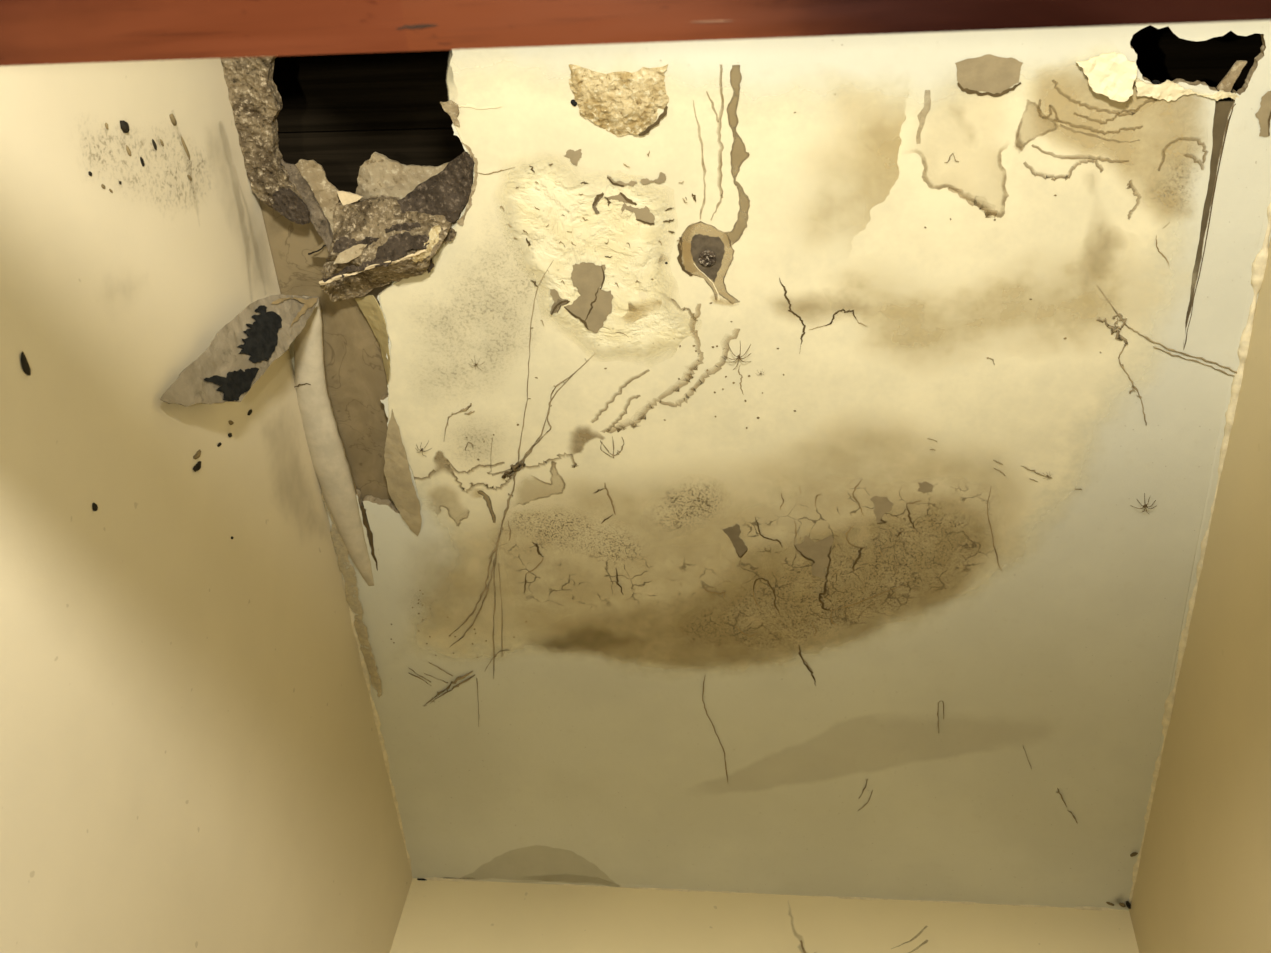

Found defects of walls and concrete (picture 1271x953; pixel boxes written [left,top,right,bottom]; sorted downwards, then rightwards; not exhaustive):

peeling [440,100,502,127]
spalling [569,64,669,137]
crack [1156,101,1236,349]
peeling [160,56,478,536]
peeling [531,242,618,333]
crack [779,278,865,354]
damp [380,64,1207,665]
crack [595,484,616,523]
crack [508,521,544,592]
crack [703,578,780,637]
crack [755,481,922,686]
crack [702,674,728,782]